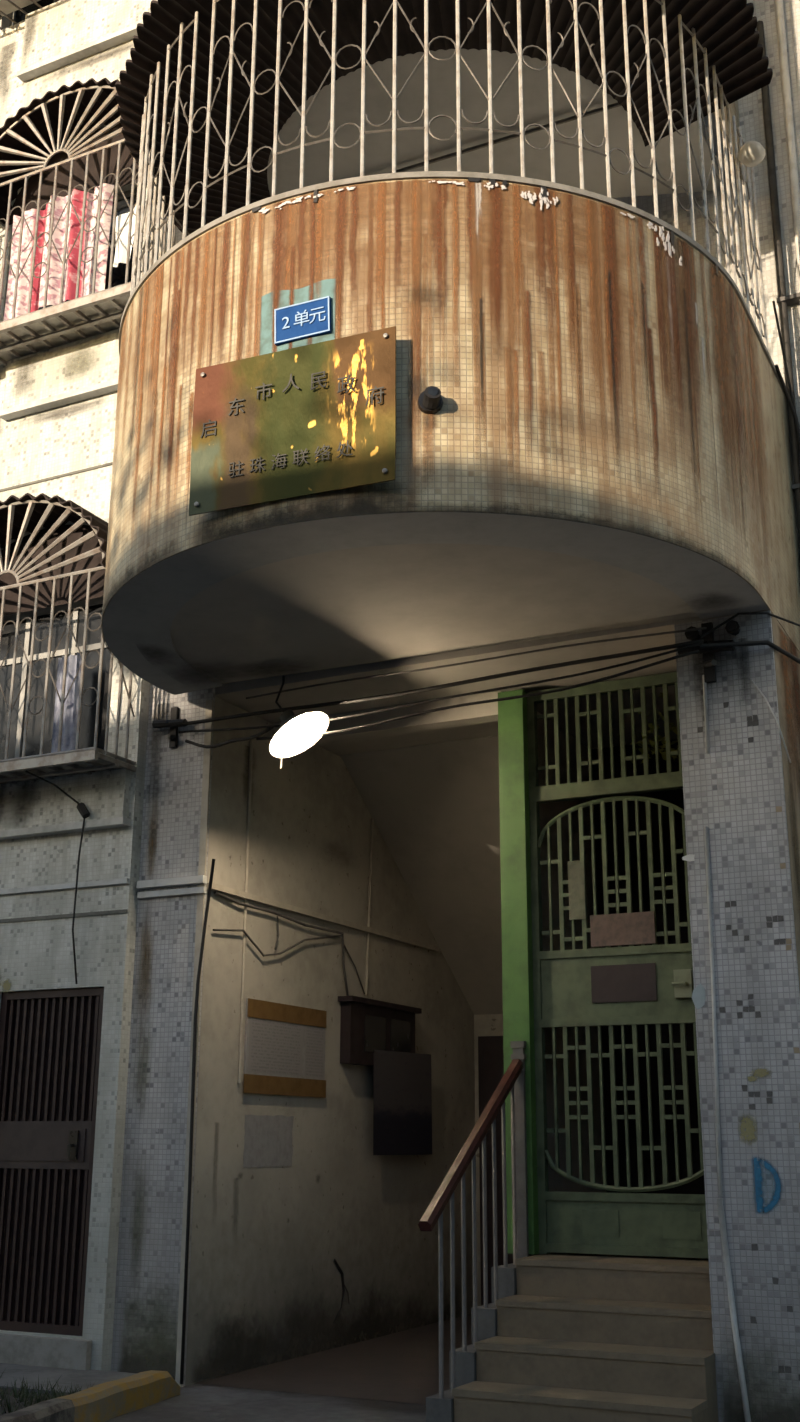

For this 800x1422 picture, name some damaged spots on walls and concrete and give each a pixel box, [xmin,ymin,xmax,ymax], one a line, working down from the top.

peeling [252,187,355,214]
peeling [428,177,559,210]
peeling [620,212,682,266]
corrosion [118,180,745,532]
water stain [196,1299,458,1382]